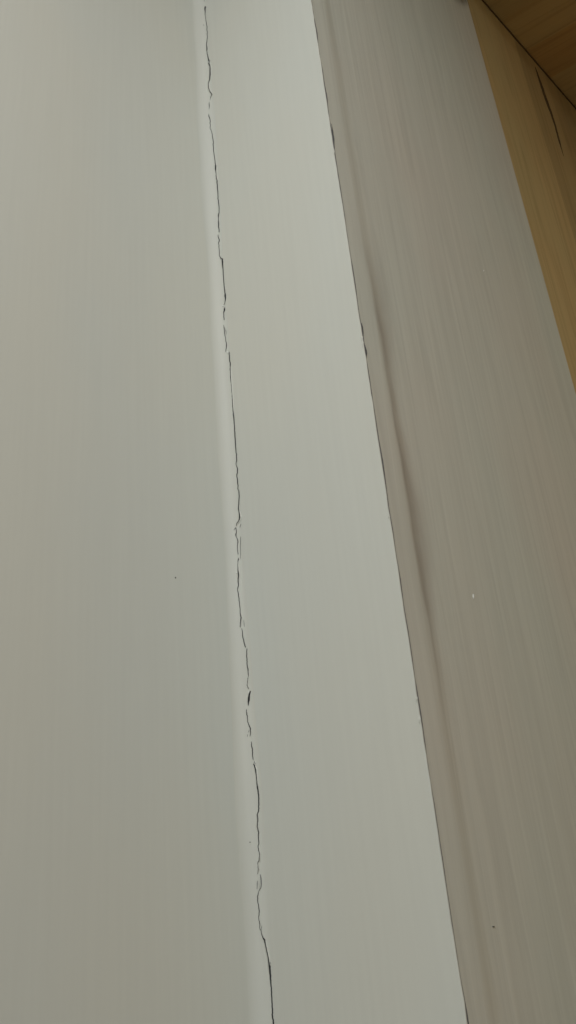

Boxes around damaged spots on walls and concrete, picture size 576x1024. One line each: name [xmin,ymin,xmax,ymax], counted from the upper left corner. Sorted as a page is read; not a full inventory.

crack [204,6,274,1024]